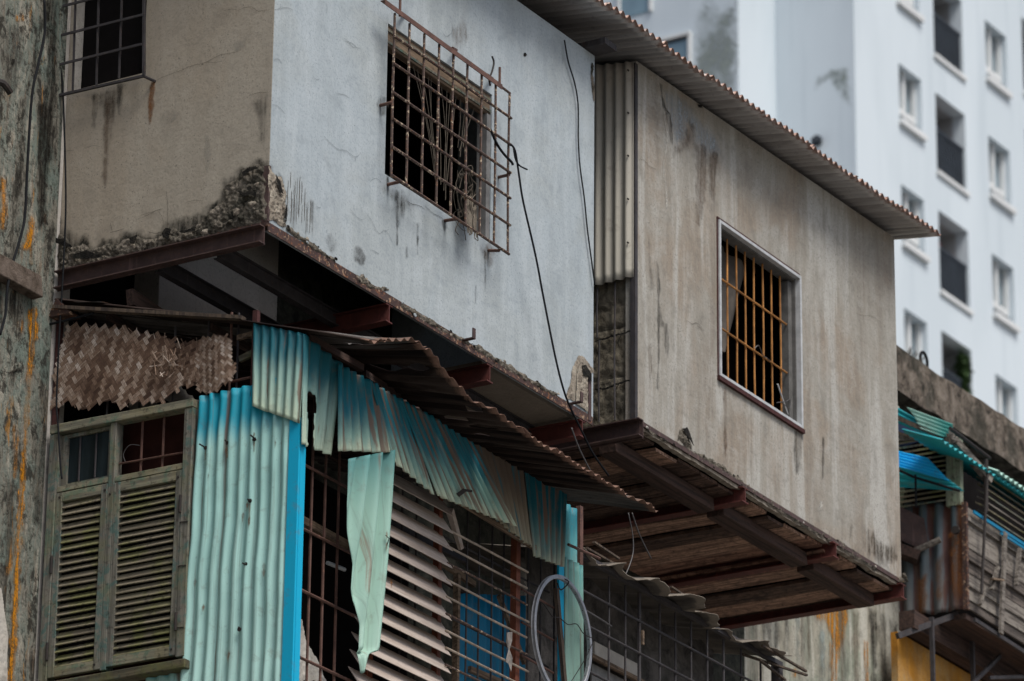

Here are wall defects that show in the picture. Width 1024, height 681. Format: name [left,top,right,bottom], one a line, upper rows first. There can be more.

spalling [56,163,338,269]